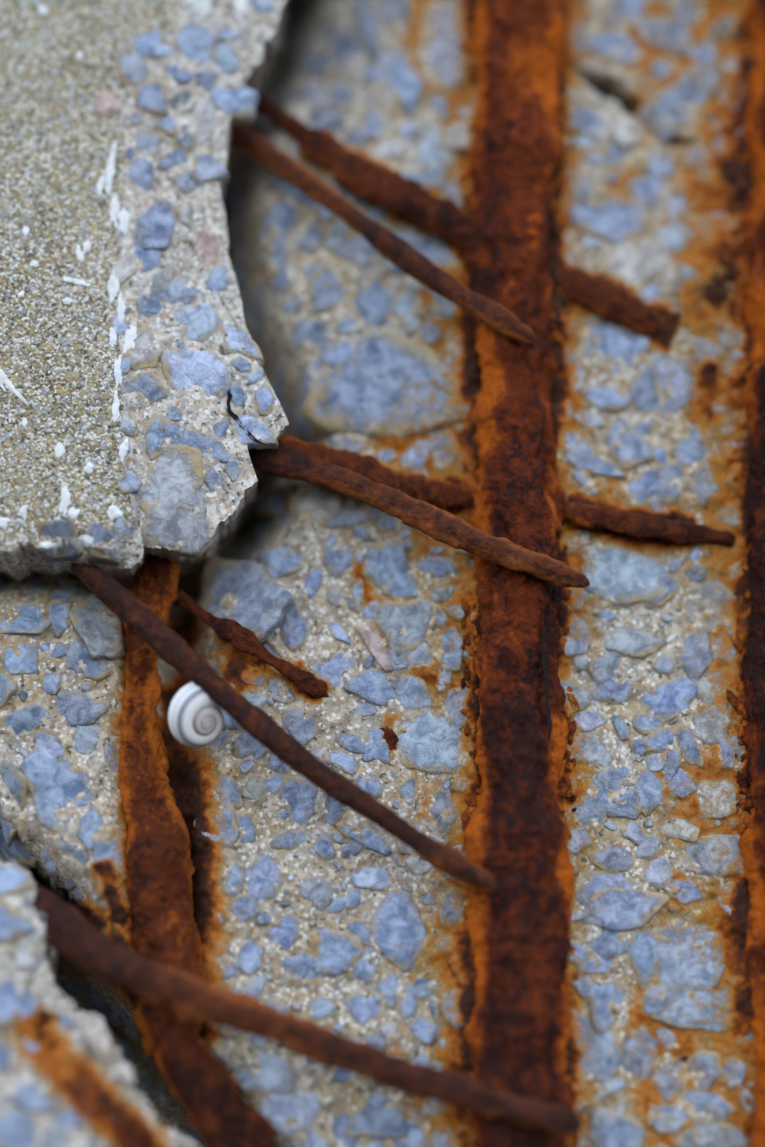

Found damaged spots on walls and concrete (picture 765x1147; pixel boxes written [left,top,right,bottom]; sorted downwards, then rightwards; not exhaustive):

spalling [0,0,744,592]
corrosion [348,284,482,528]
crack [0,805,84,915]
spalling [0,572,208,1147]
corrosion [80,621,134,950]
corrosion [159,670,234,989]
spalling [131,476,580,1106]
corrosion [372,525,482,856]
corrosion [548,0,756,1147]
spalling [560,0,765,1147]
corrosion [3,1001,171,1147]
spalling [209,1024,569,1147]